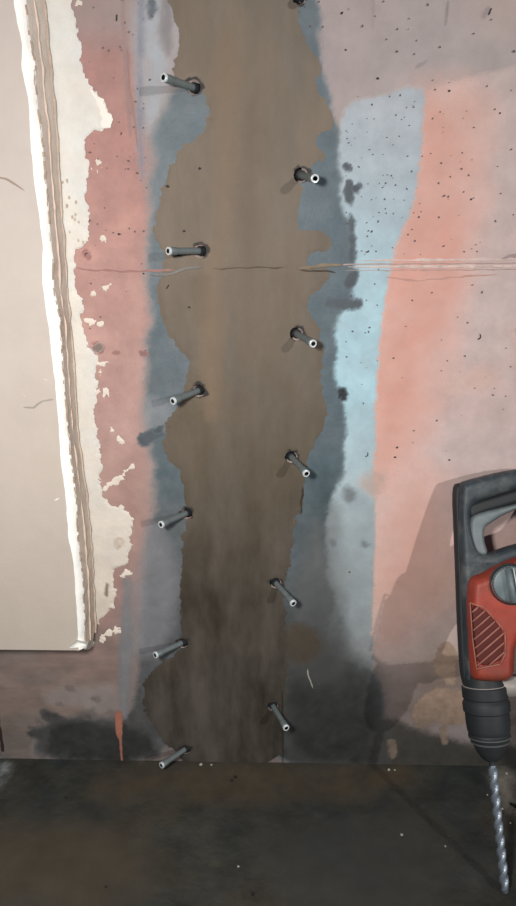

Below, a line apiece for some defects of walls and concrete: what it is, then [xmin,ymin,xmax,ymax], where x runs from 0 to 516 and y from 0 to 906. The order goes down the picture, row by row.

leakage [295,0,331,110]
peeling [90,89,113,128]
crack [76,254,516,281]
spalling [92,341,119,376]
peeling [102,464,135,491]
peeling [99,626,121,643]
rust [115,711,123,761]